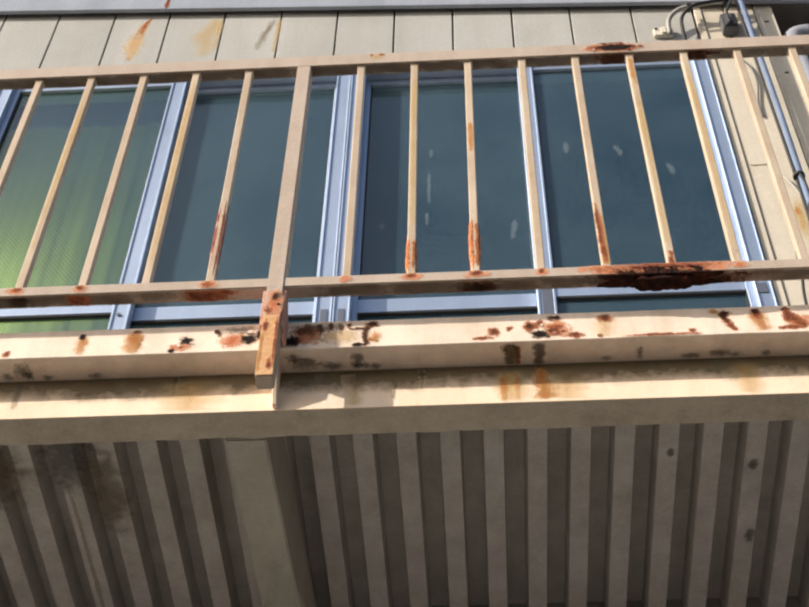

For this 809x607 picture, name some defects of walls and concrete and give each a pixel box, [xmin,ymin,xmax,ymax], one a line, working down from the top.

rust [593,203,610,263]
rust [710,310,738,330]
rust [750,307,809,330]
rust [77,334,88,352]
rust [124,330,143,352]
rust [255,289,283,375]
rust [292,323,352,345]
rust [472,326,513,340]
rust [500,345,521,364]
rust [532,343,555,398]
damp [280,351,809,387]
damp [0,368,256,399]